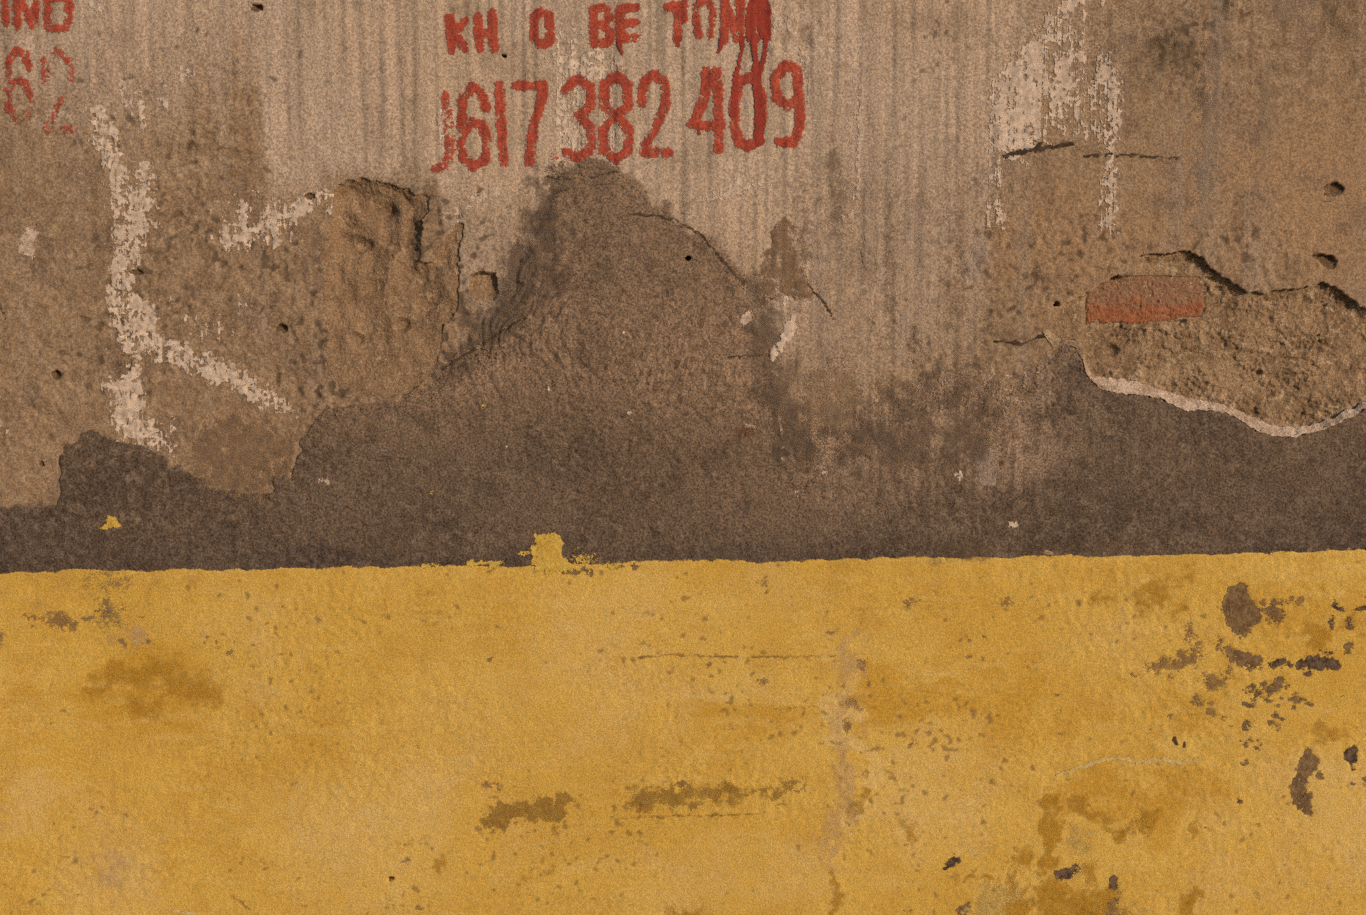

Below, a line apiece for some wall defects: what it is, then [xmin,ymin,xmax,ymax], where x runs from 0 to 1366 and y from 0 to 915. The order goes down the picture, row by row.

water stain [116,205,161,268]
flaking render [304,177,499,399]
water stain [223,360,256,390]
flaking render [1043,251,1366,438]
peeling [1131,578,1366,766]
peeling [1288,747,1325,816]
peeling [1344,745,1366,787]